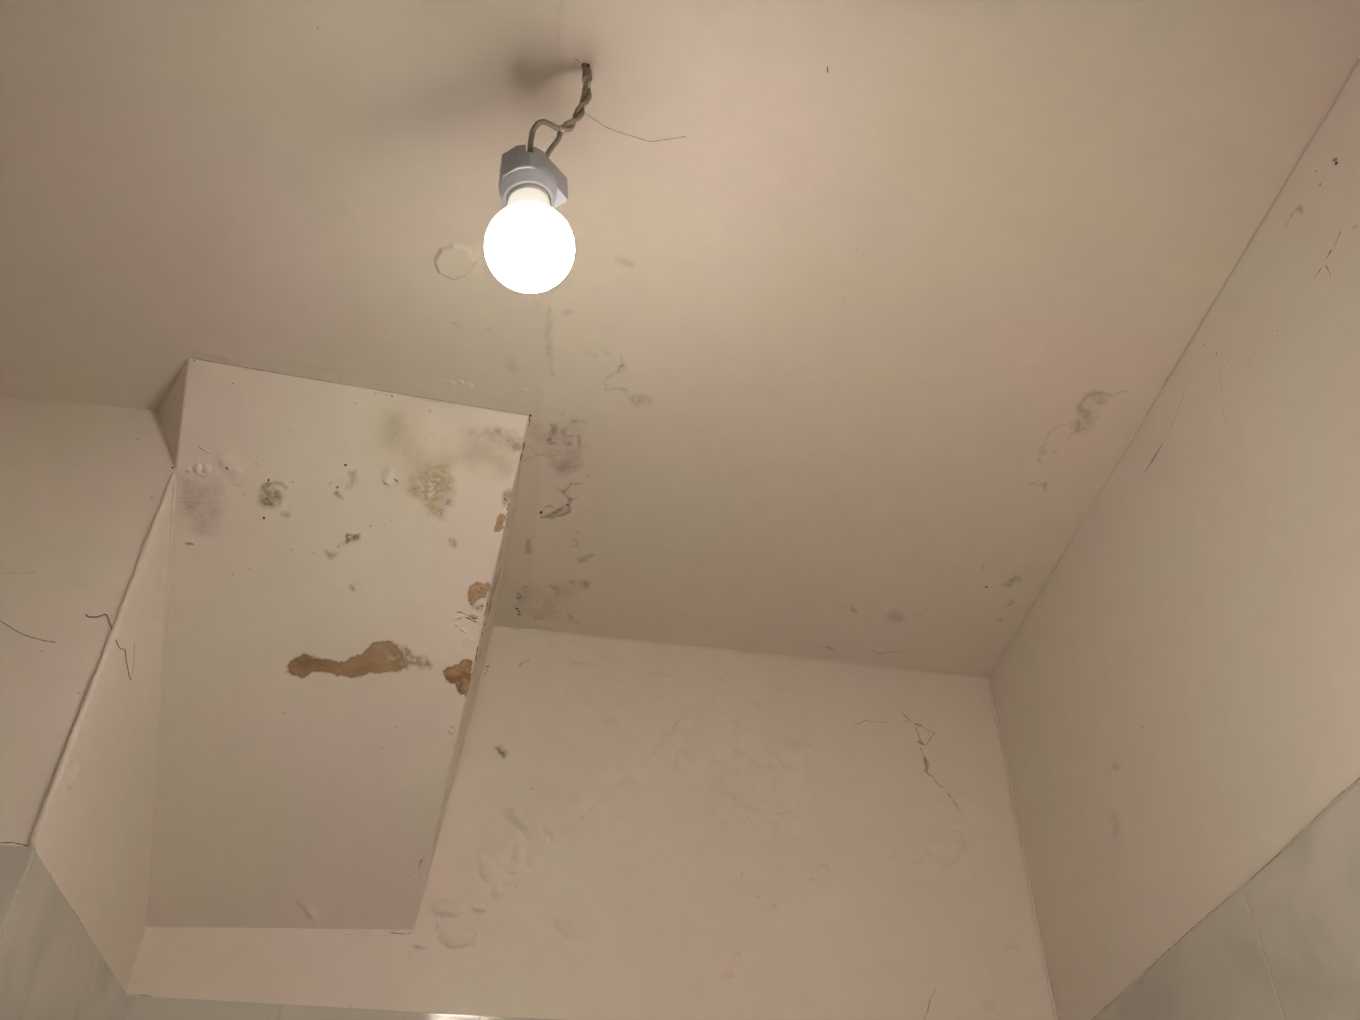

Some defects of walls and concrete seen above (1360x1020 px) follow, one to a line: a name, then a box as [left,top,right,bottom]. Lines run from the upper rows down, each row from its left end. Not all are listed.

peeling [451,611,486,649]
crack [853,707,957,806]